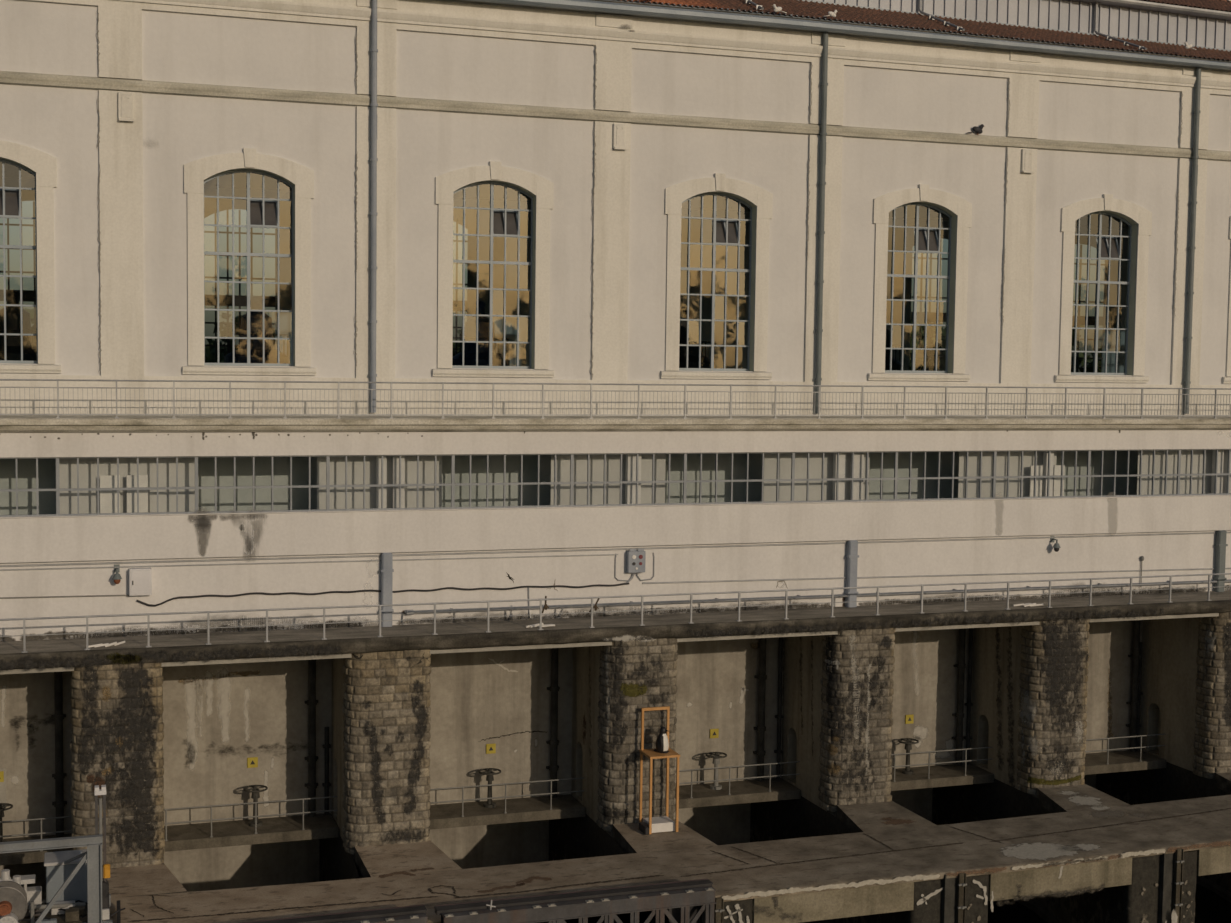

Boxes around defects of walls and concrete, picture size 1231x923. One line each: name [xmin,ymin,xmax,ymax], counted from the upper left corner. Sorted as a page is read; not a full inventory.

damp [189,509,259,556]
damp [0,644,343,807]
damp [0,619,379,642]
damp [398,587,1206,787]